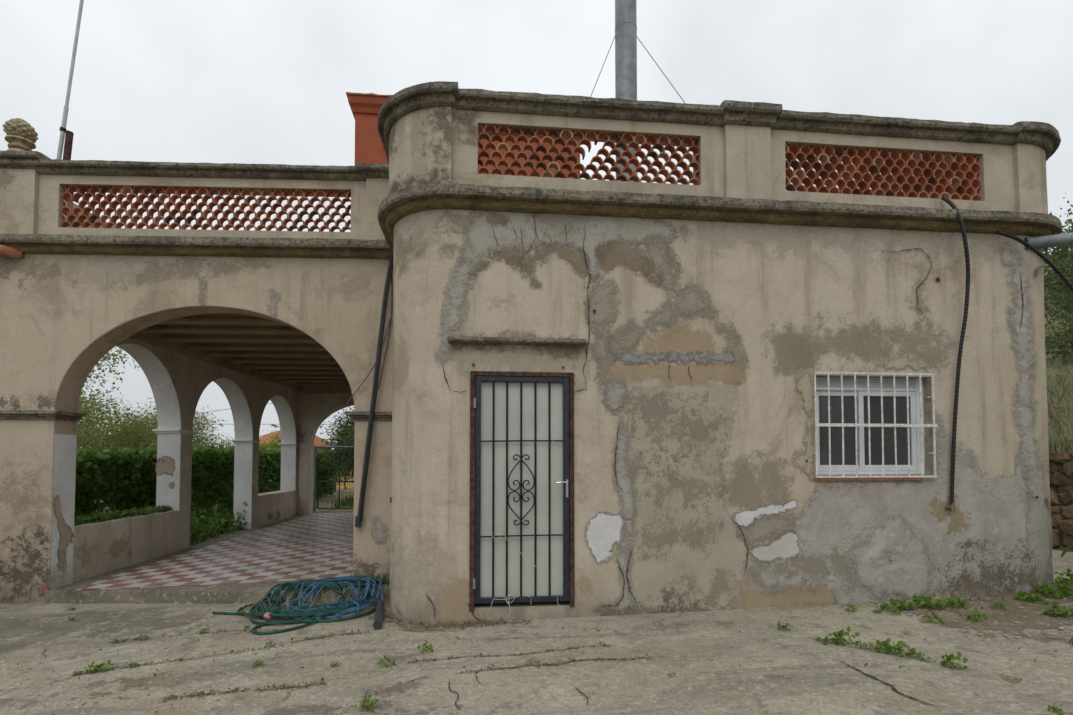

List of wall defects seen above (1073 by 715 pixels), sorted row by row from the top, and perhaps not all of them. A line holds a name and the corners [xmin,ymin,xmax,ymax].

crack [492,213,591,392]
flaking render [574,350,589,389]
peeling [155,455,175,489]
peeling [53,495,74,573]
peeling [585,510,627,564]
crack [599,419,637,614]
peeling [732,499,799,527]
peeling [749,531,801,562]